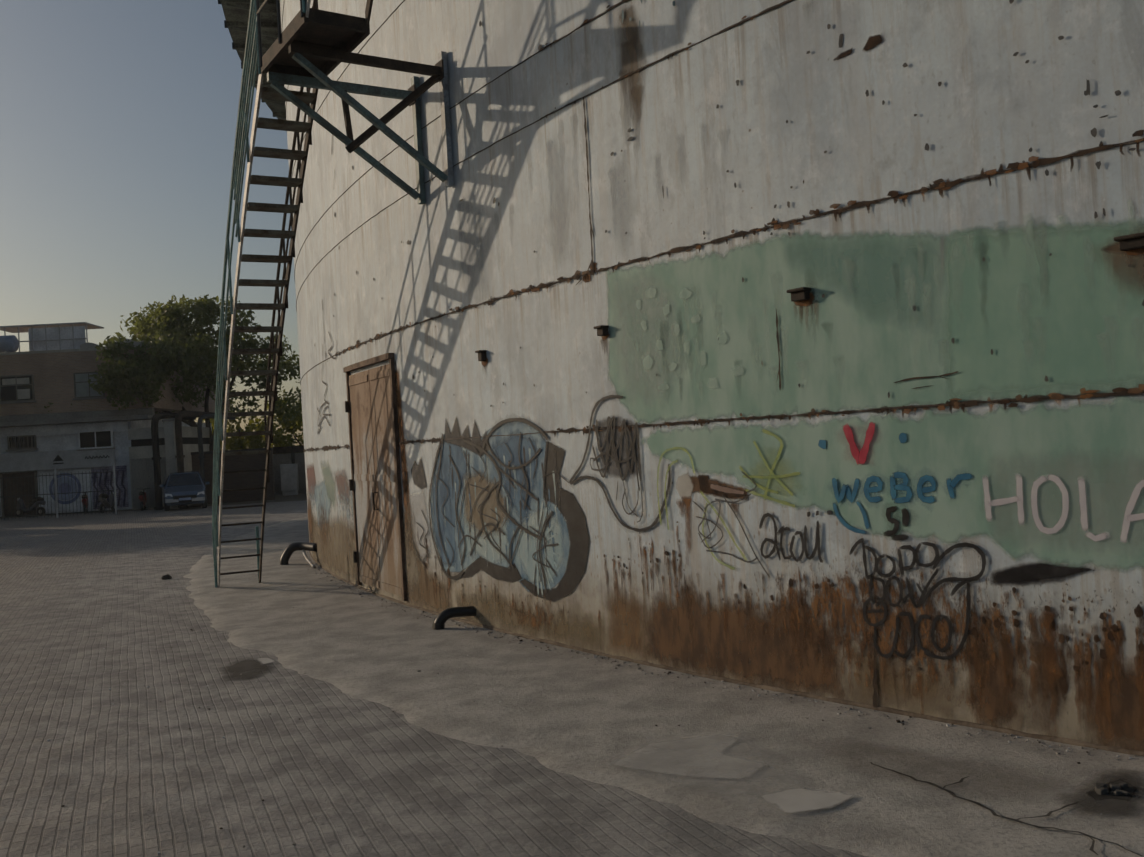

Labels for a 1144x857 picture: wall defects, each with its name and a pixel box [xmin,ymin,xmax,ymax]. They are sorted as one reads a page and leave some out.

leakage [620,0,640,108]
rust [335,130,1144,358]
rust [307,490,357,579]
spalling [676,473,748,547]
rust [395,362,1144,751]
crack [870,762,1142,856]